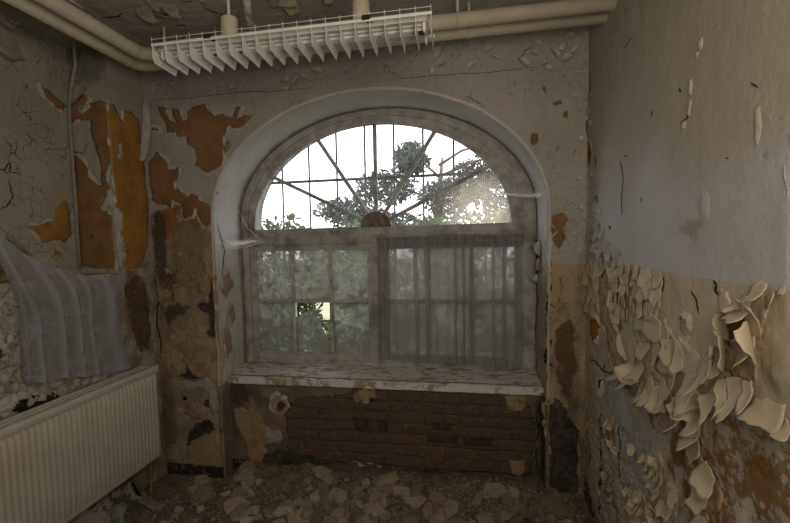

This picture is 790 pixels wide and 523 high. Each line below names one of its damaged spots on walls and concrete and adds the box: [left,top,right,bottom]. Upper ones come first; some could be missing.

crack [0,137,67,210]
peeling [23,81,253,272]
flaking render [197,269,236,358]
flaking render [0,328,60,419]
flaking render [176,365,224,467]
flaking render [233,388,583,495]
peeling [581,223,790,523]